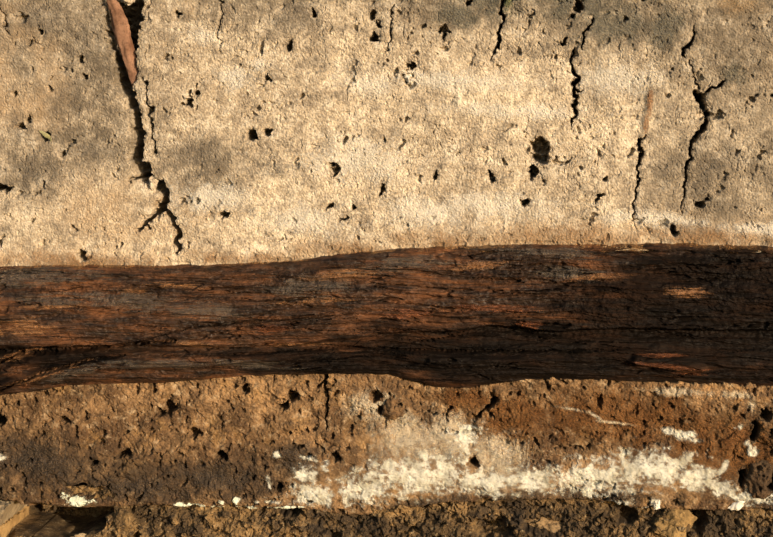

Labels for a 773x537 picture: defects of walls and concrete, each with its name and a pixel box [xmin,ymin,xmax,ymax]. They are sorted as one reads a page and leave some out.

crack [100,0,184,256]
crack [567,16,595,127]
crack [679,24,726,216]
crack [0,182,14,195]
damp [0,418,773,509]